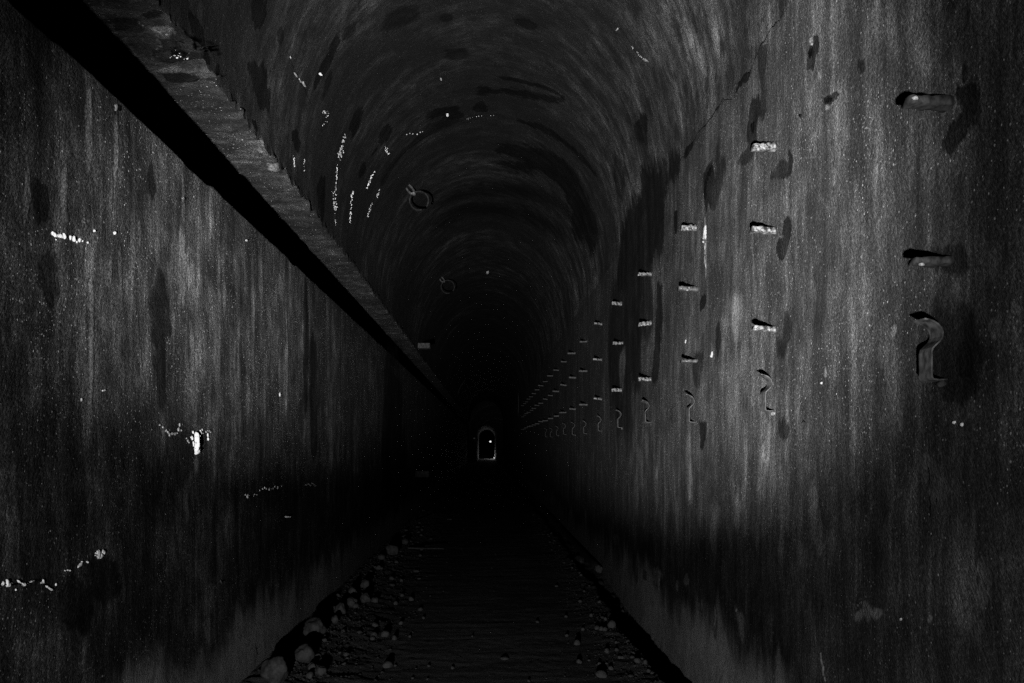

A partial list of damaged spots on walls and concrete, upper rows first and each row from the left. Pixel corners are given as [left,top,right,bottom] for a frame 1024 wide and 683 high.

water stain [136,226,226,553]
water stain [1,530,127,636]